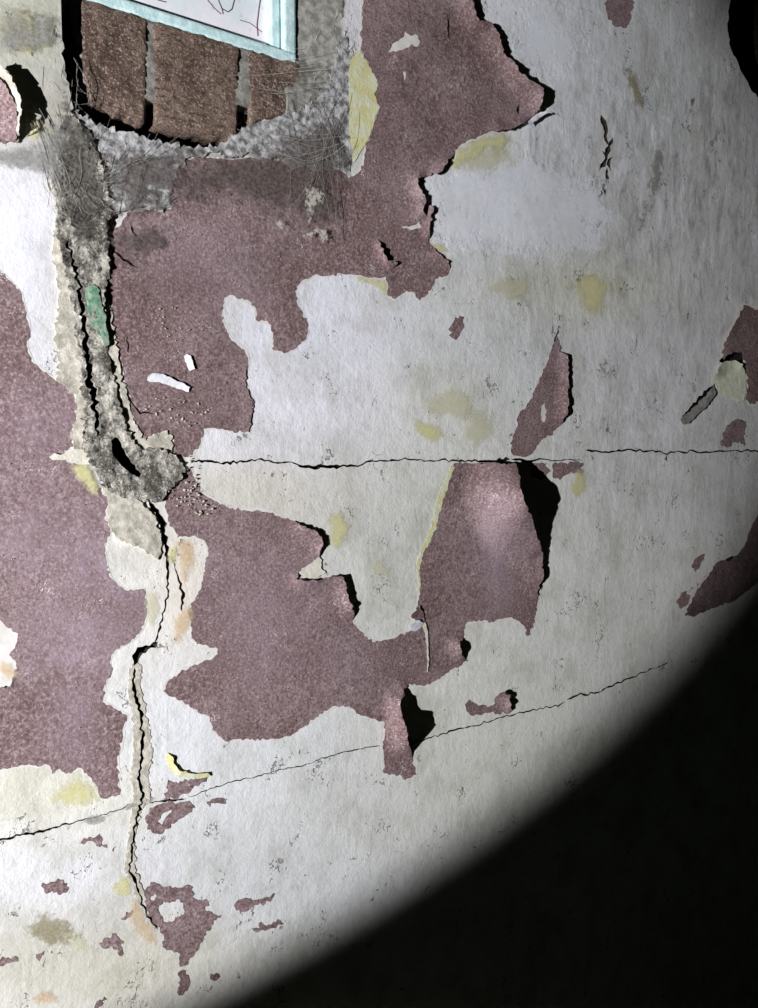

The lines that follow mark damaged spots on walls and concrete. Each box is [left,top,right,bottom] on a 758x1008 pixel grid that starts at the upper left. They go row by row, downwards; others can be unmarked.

water stain [27,120,53,138]
peeling [680,303,758,425]
peeling [0,0,570,905]
crack [191,449,758,470]
crack [0,206,380,930]
peeling [685,515,758,617]
crack [413,662,668,744]